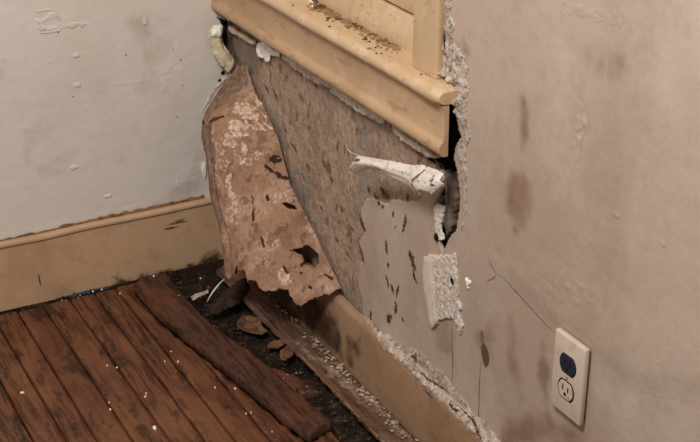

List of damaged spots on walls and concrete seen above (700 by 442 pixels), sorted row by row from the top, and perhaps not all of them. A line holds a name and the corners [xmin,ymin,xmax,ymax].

flaking render [222,0,501,442]
crack [488,258,555,332]